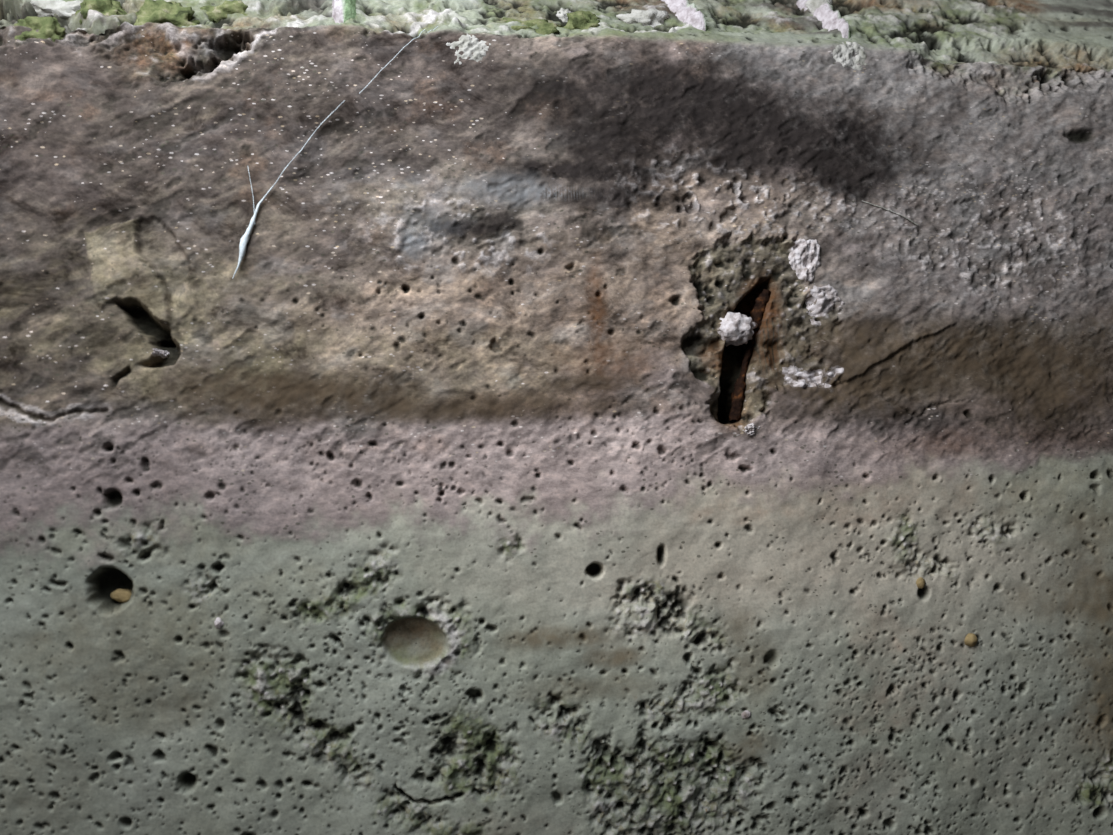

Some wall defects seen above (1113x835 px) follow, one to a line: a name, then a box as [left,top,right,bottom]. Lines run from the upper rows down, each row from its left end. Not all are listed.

peeling [85,216,192,388]
corrosion [739,295,779,369]
spalling [682,233,844,430]
water stain [777,239,1113,417]